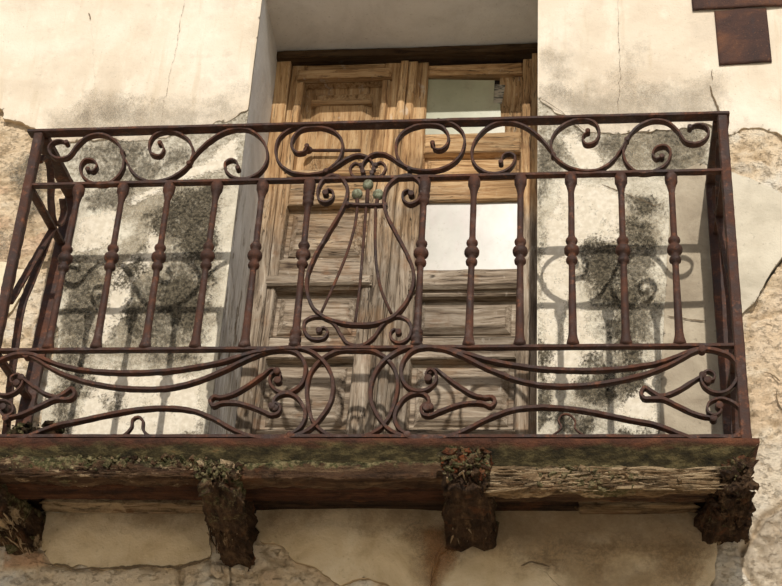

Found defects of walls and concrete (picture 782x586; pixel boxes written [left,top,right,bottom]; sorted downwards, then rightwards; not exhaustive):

flaking render [0,112,33,293]
flaking render [0,154,65,434]
peeling [73,210,116,254]
peeling [102,229,159,343]
damp [53,139,220,433]
peeling [168,138,239,180]
damp [538,139,566,204]
damp [538,194,664,434]
damp [592,128,705,169]
peeling [69,364,204,434]
flaking render [711,263,782,586]
flaking render [0,526,386,586]